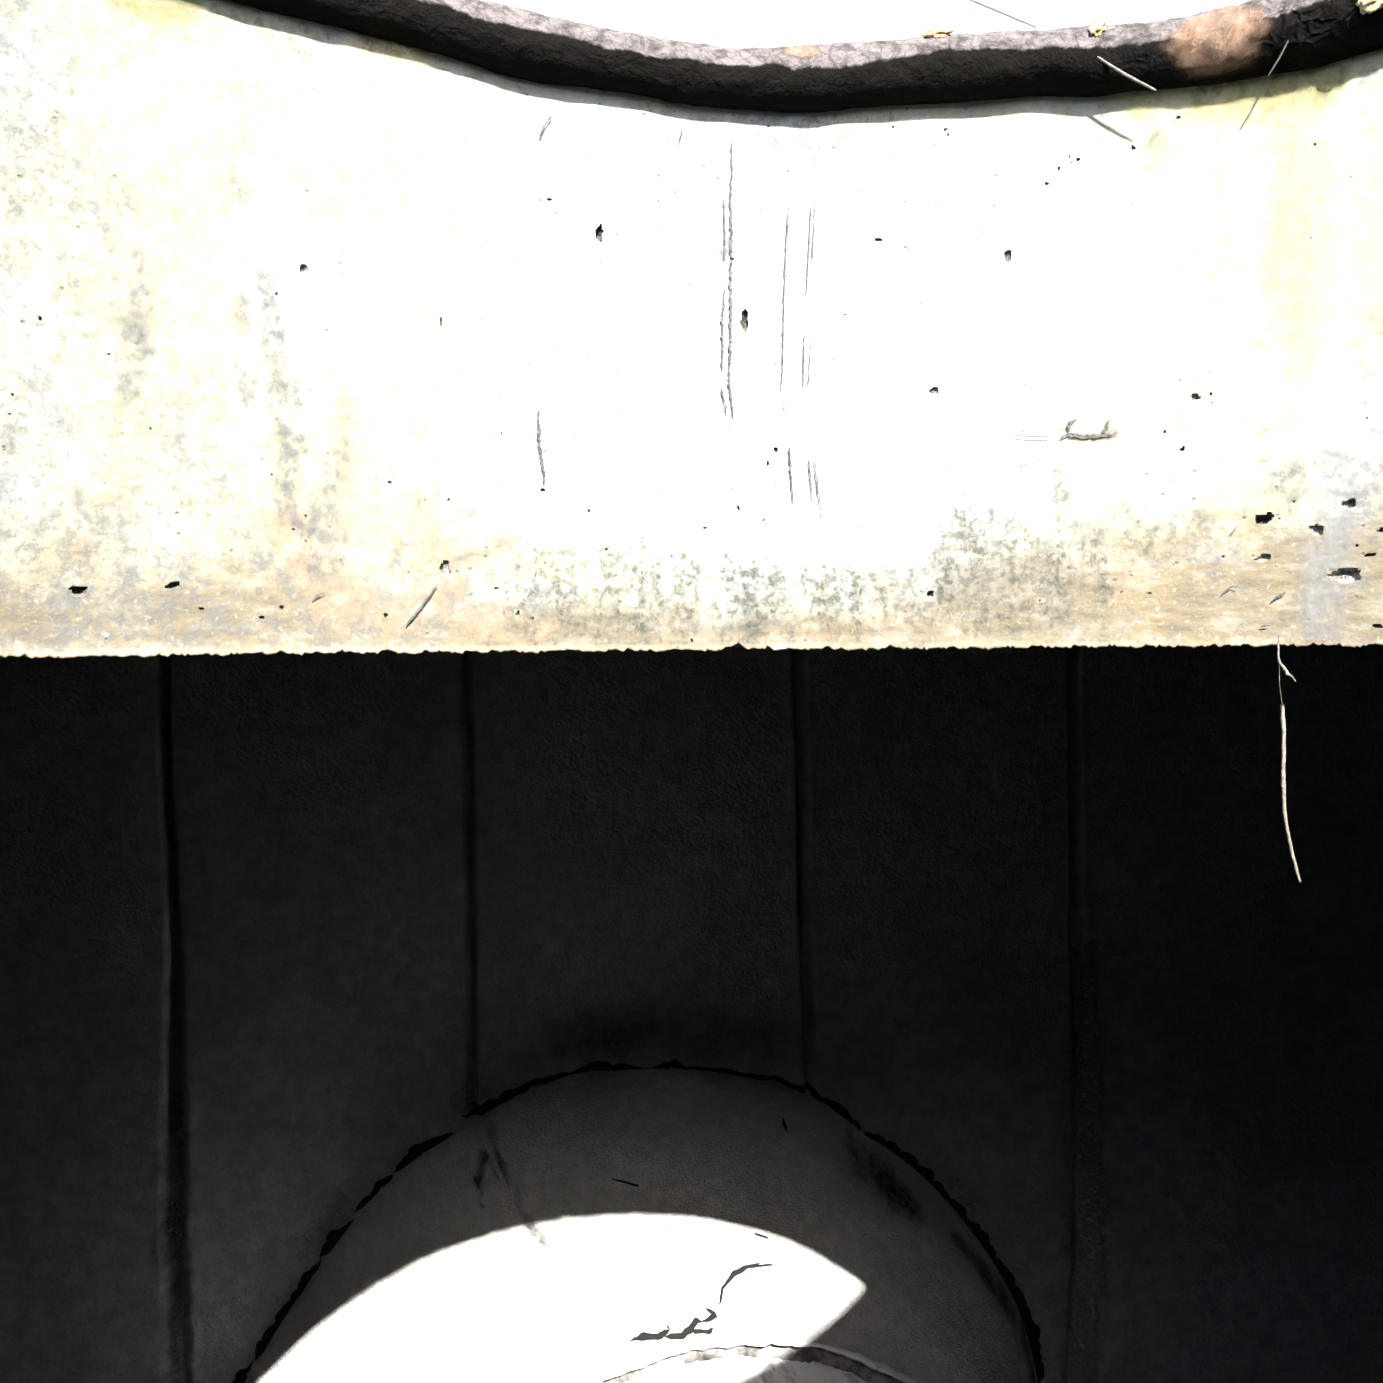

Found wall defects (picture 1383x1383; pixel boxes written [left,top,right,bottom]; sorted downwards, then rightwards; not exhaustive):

rust [1176,7,1262,74]
crack [231,1060,1044,1383]